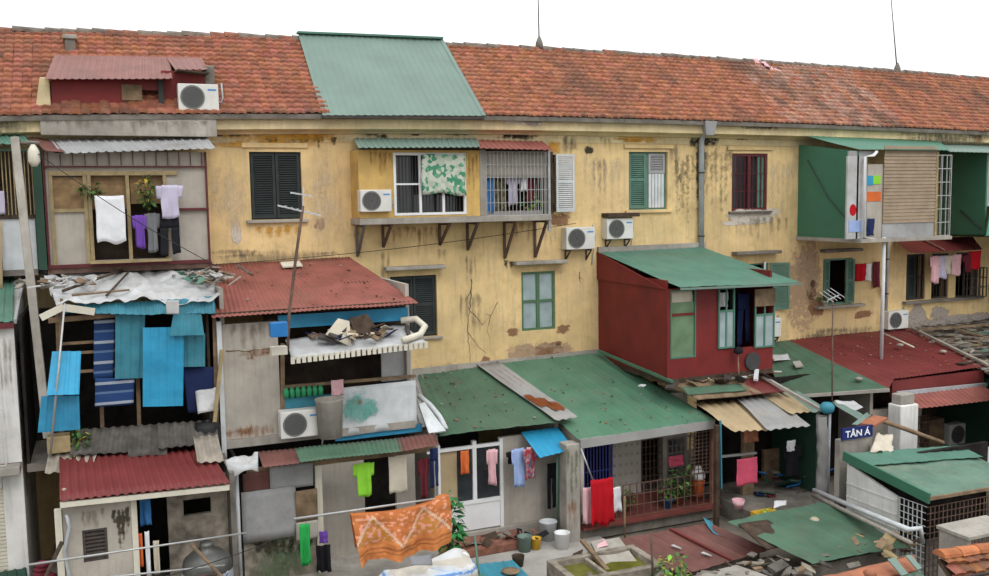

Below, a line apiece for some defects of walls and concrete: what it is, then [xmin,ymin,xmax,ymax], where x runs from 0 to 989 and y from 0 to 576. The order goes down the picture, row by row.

water stain [675,138,733,205]
crack [465,279,498,354]
flaking render [908,304,989,328]
flaking render [507,325,571,358]
corrosion [524,395,565,410]